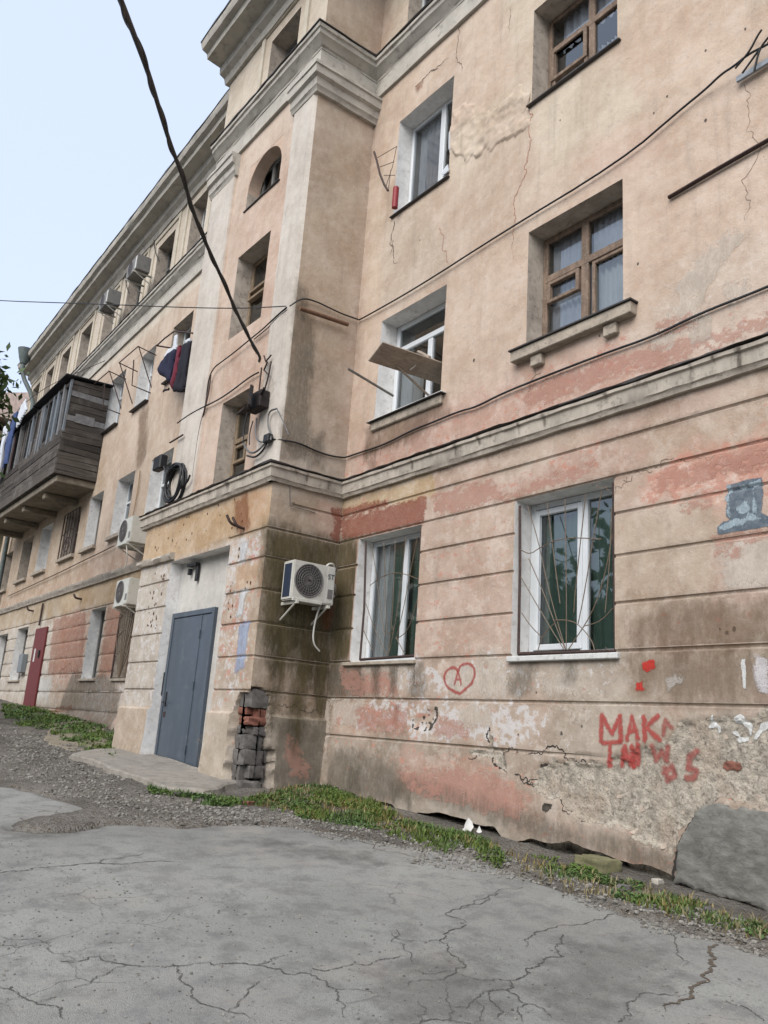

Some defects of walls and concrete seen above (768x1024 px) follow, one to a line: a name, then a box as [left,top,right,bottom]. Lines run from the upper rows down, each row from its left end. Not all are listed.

crack [512,110,533,259]
peeling [330,496,427,543]
leakage [261,527,357,750]
spalling [412,706,438,731]
crack [473,727,601,822]
flaking render [533,706,768,859]